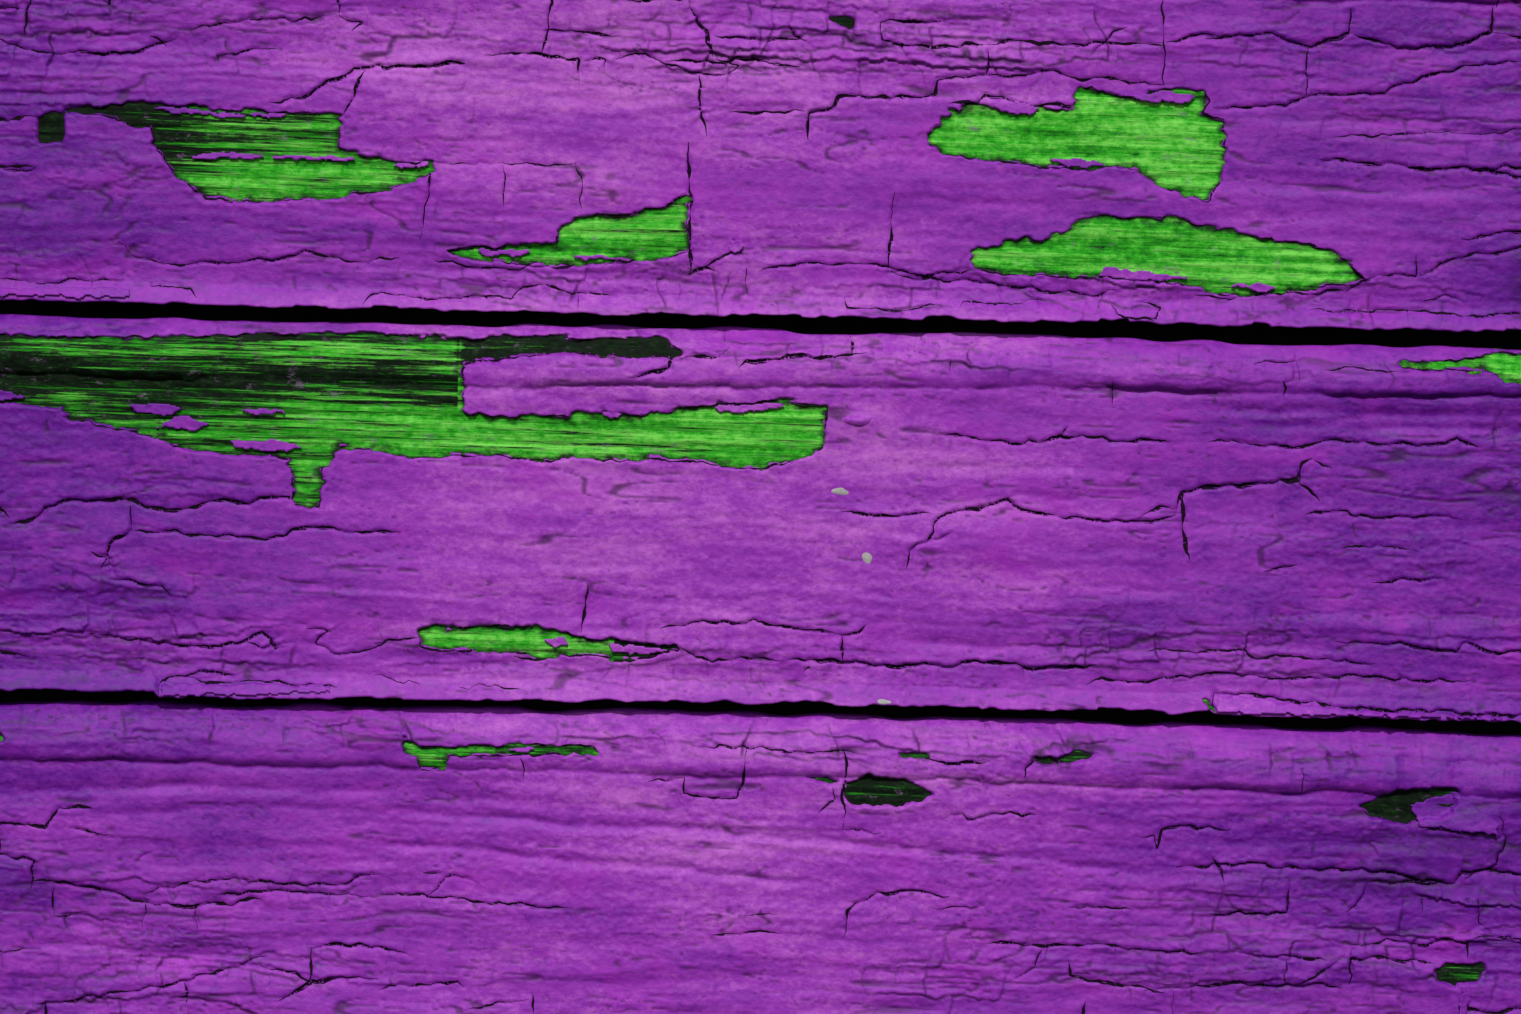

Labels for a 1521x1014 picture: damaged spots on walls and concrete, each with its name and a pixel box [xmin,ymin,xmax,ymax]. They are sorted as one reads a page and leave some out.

peeling [38,101,435,203]
peeling [446,193,692,267]
crack [272,0,1521,378]
peeling [927,86,1227,203]
peeling [971,215,1366,297]
peeling [0,332,828,509]
crack [0,496,401,597]
crack [841,437,1479,584]
peeling [418,624,679,666]
crack [662,619,1521,719]
crack [0,804,570,933]
crack [987,816,1521,1014]